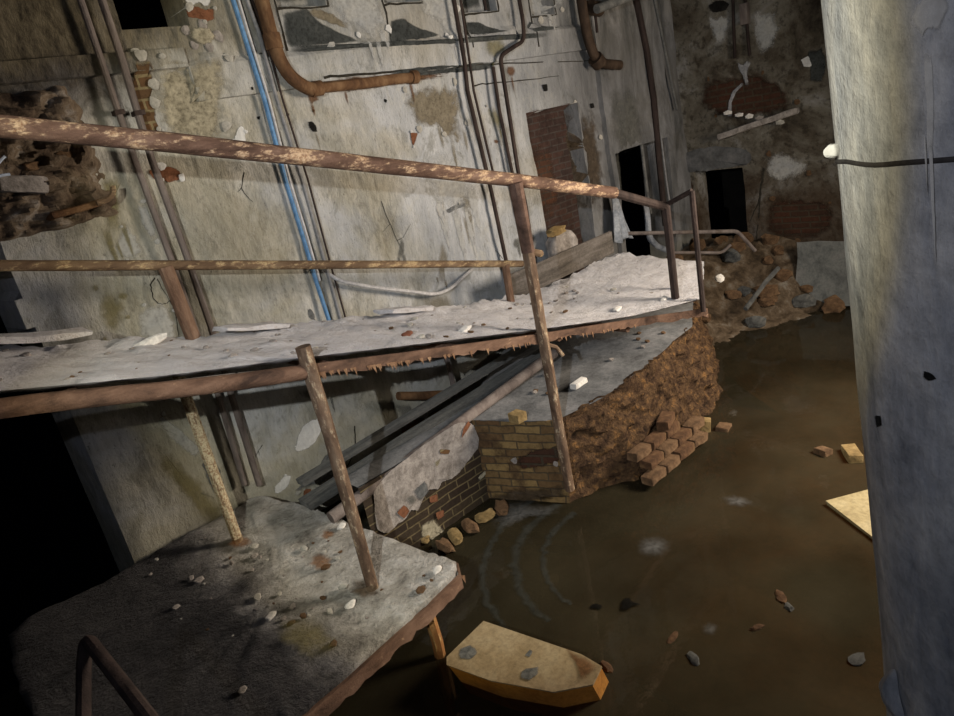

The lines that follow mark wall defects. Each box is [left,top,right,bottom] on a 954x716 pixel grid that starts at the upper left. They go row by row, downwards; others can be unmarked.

spalling [172,0,217,24]
spalling [0,85,84,123]
spalling [131,48,161,131]
spalling [703,70,800,118]
peeling [232,126,248,141]
spalling [533,152,554,179]
peeling [566,118,603,185]
spalling [0,138,140,260]
peeling [139,199,160,244]
spalling [540,190,556,215]
spalling [769,196,832,242]
peeling [374,421,479,533]